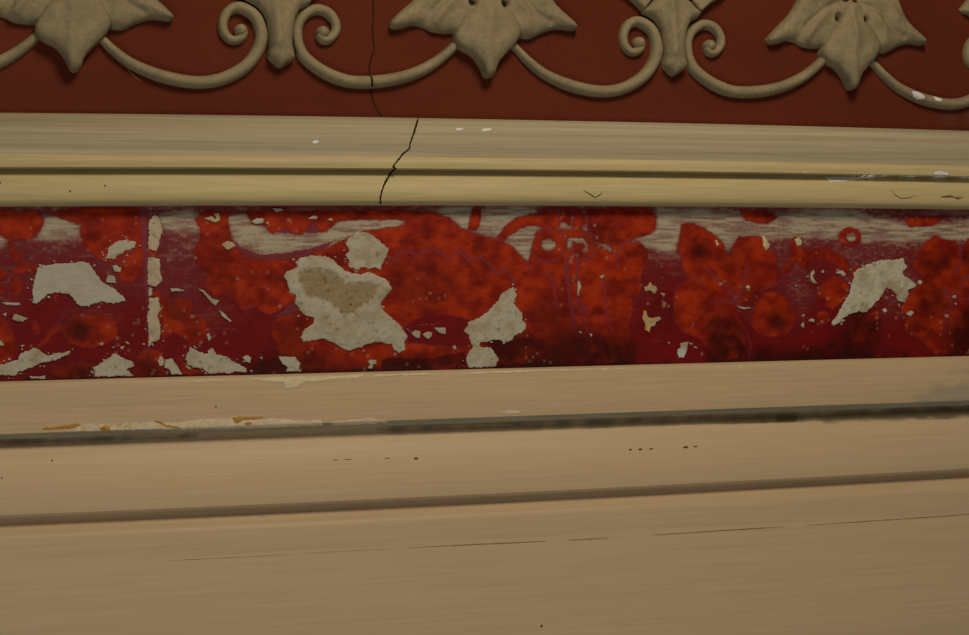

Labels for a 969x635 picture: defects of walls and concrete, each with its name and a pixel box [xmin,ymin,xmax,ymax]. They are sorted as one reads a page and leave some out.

crack [368,0,382,116]
crack [379,118,419,204]
peeling [825,171,969,182]
peeling [0,345,73,379]
peeling [2,215,185,347]
peeling [89,341,134,377]
peeling [158,227,446,389]
peeling [453,283,628,375]
peeling [642,311,661,332]
peeling [668,342,697,358]
peeling [805,258,922,326]
peeling [74,418,389,432]